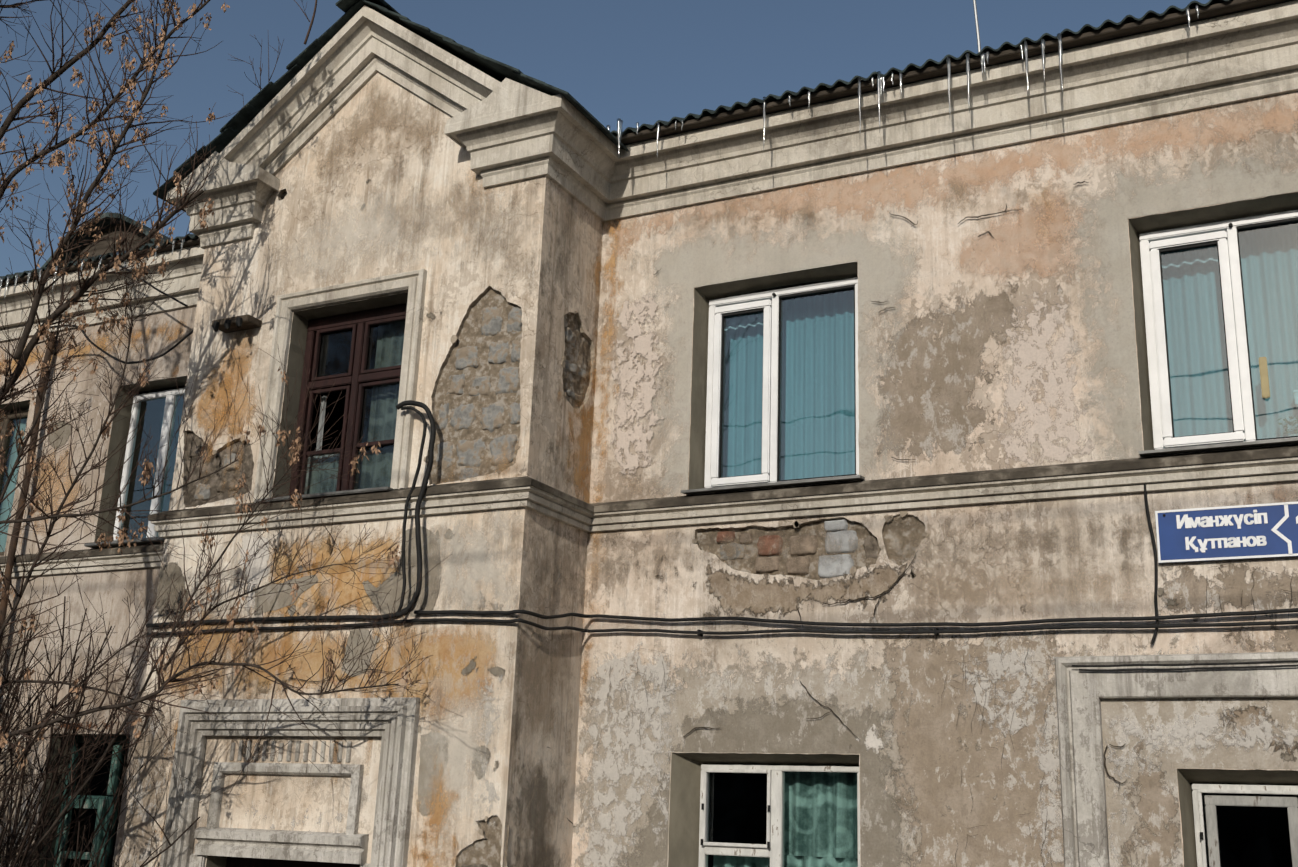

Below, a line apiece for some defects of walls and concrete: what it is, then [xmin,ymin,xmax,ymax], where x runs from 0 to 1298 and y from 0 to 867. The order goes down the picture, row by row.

flaking render [181,431,254,507]
flaking render [423,288,522,484]
flaking render [561,311,591,409]
peeling [573,510,1099,867]
flaking render [458,815,509,867]
peeling [1101,697,1298,867]